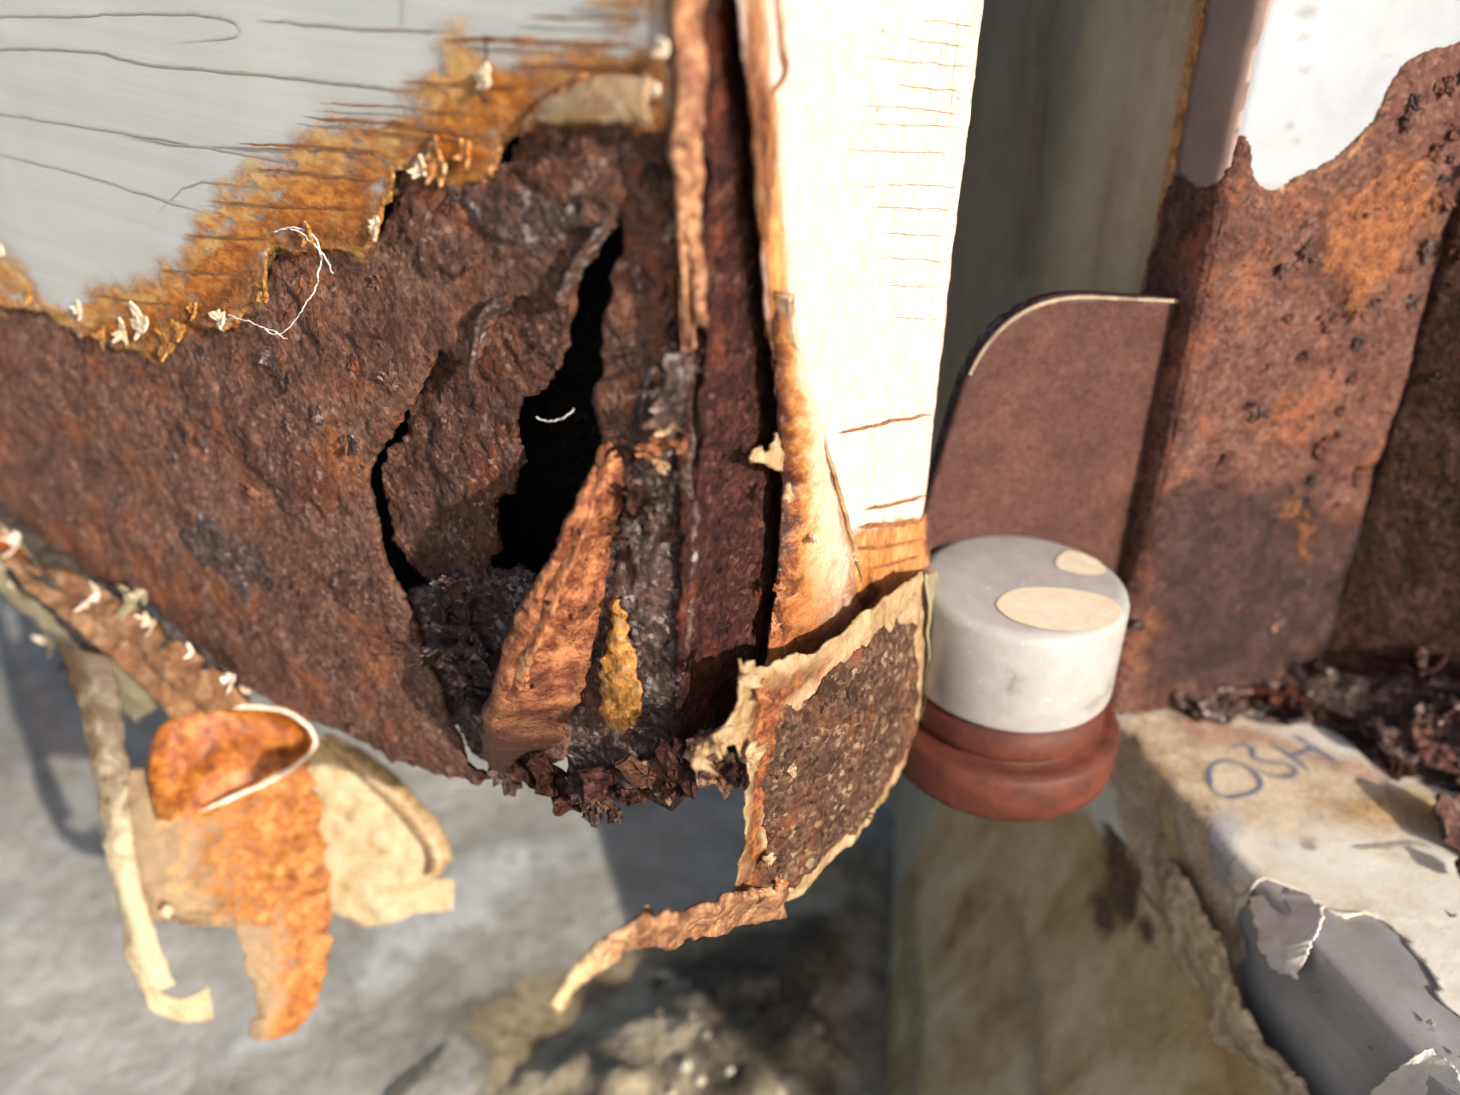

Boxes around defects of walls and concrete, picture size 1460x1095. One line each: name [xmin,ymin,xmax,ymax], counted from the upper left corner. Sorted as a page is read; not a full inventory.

crack [0,0,655,305]
peeling [407,134,471,187]
peeling [499,73,661,163]
peeling [69,300,226,362]
rust [0,0,789,828]
spalling [407,224,624,718]
rust [1109,0,1460,835]
peeling [548,570,940,1014]
rust [1093,822,1152,941]
peeling [1247,892,1325,980]
crack [386,1043,452,1095]
peeling [1370,1047,1460,1095]